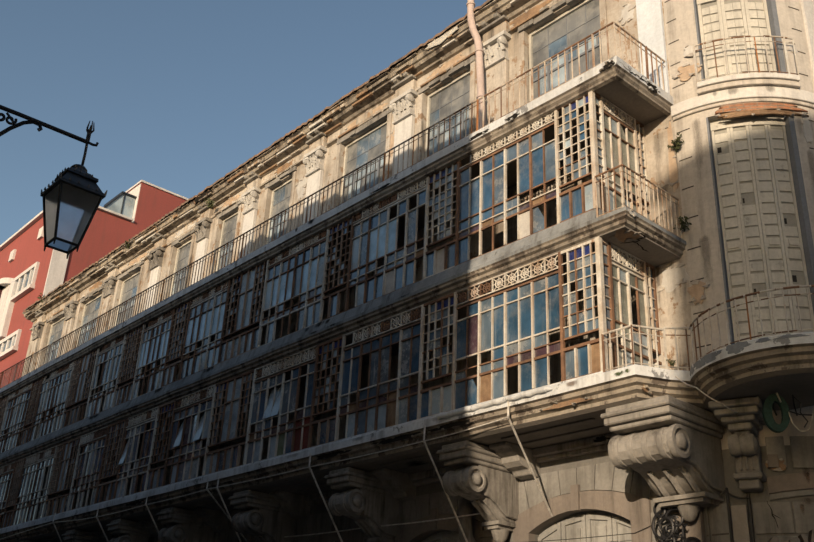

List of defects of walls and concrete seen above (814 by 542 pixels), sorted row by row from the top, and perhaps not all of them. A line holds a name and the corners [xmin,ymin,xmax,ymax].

flaking render [672,45,703,81]
flaking render [657,263,710,305]